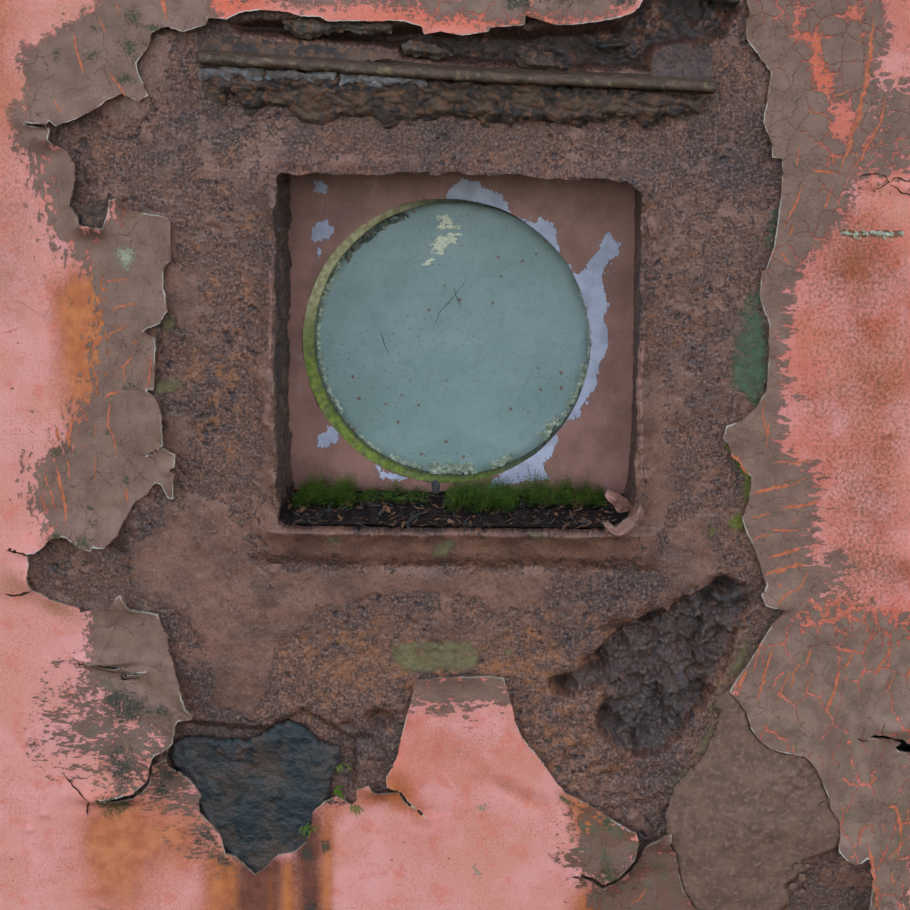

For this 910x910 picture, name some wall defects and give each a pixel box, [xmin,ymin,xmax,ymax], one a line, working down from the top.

crack [843,173,910,200]
corrosion [55,274,118,410]
peeling [3,0,633,600]
peeling [549,0,910,910]
water stain [97,796,134,819]
water stain [102,741,135,789]
water stain [102,688,168,724]
peeling [26,595,245,881]
peeling [355,754,410,810]
peeling [407,675,511,732]
crack [740,704,838,820]
corrosion [206,813,332,910]